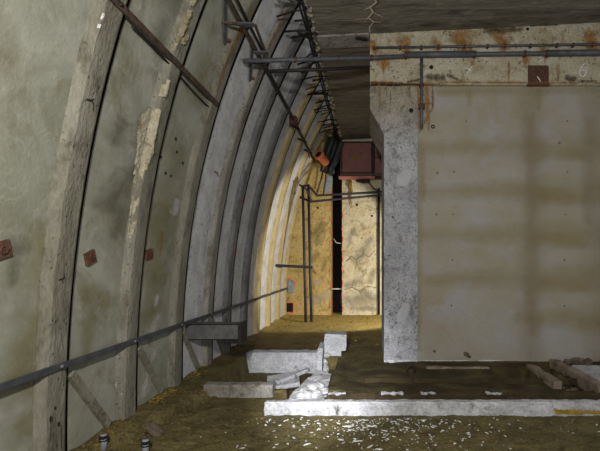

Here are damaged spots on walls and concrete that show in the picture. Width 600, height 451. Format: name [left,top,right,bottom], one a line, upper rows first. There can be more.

crack [365,0,382,33]
peeling [159,80,170,98]
corrosion [370,81,576,133]
peeling [133,106,161,184]
peeling [127,195,139,239]